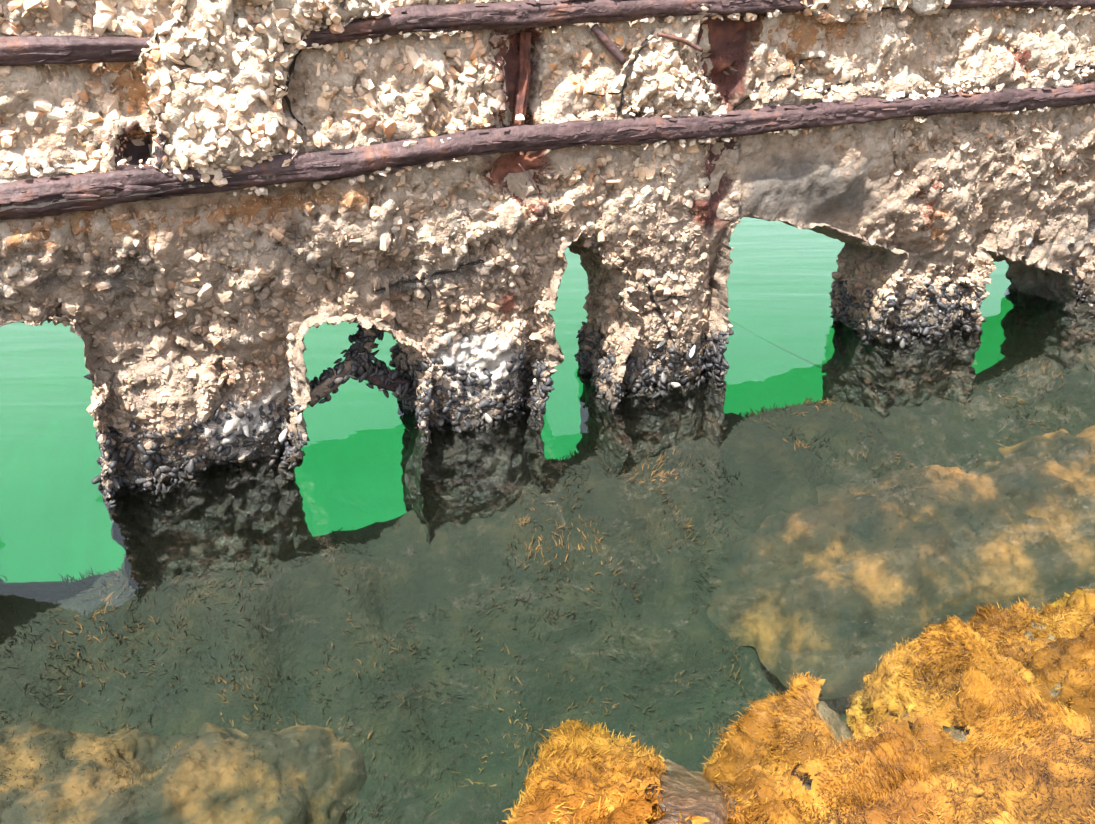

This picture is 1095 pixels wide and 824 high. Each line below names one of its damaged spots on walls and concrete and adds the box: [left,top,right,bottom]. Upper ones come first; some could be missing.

corrosion [475,28,544,129]
crack [588,39,650,116]
corrosion [695,14,870,112]
corrosion [484,150,549,224]